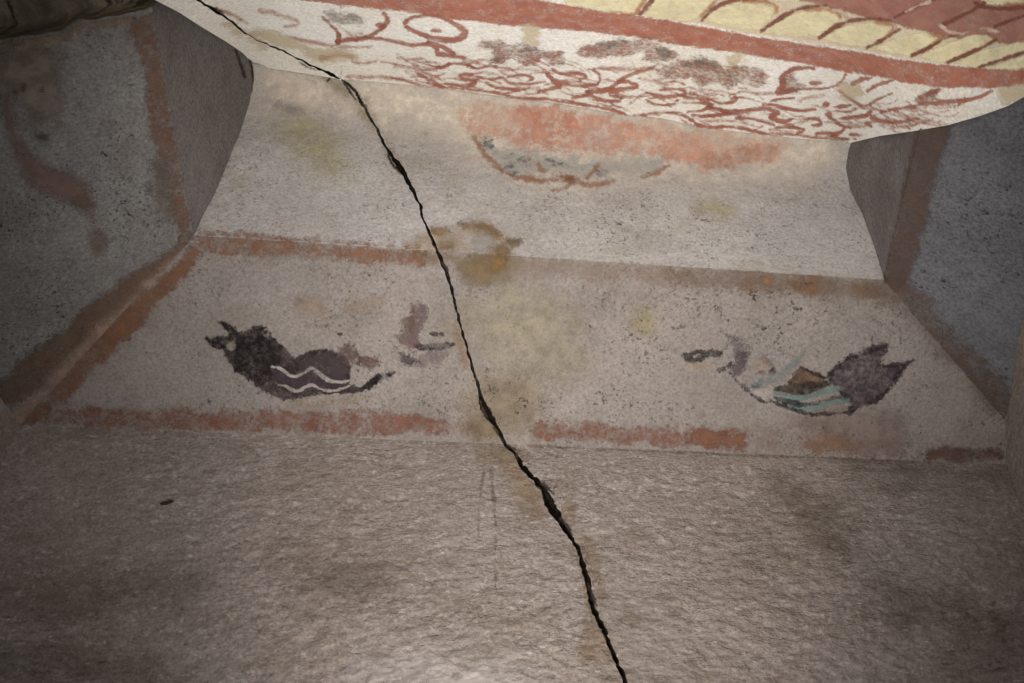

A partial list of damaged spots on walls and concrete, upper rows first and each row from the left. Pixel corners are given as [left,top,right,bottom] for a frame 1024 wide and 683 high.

crack [196,0,639,683]
leakage [423,223,522,285]